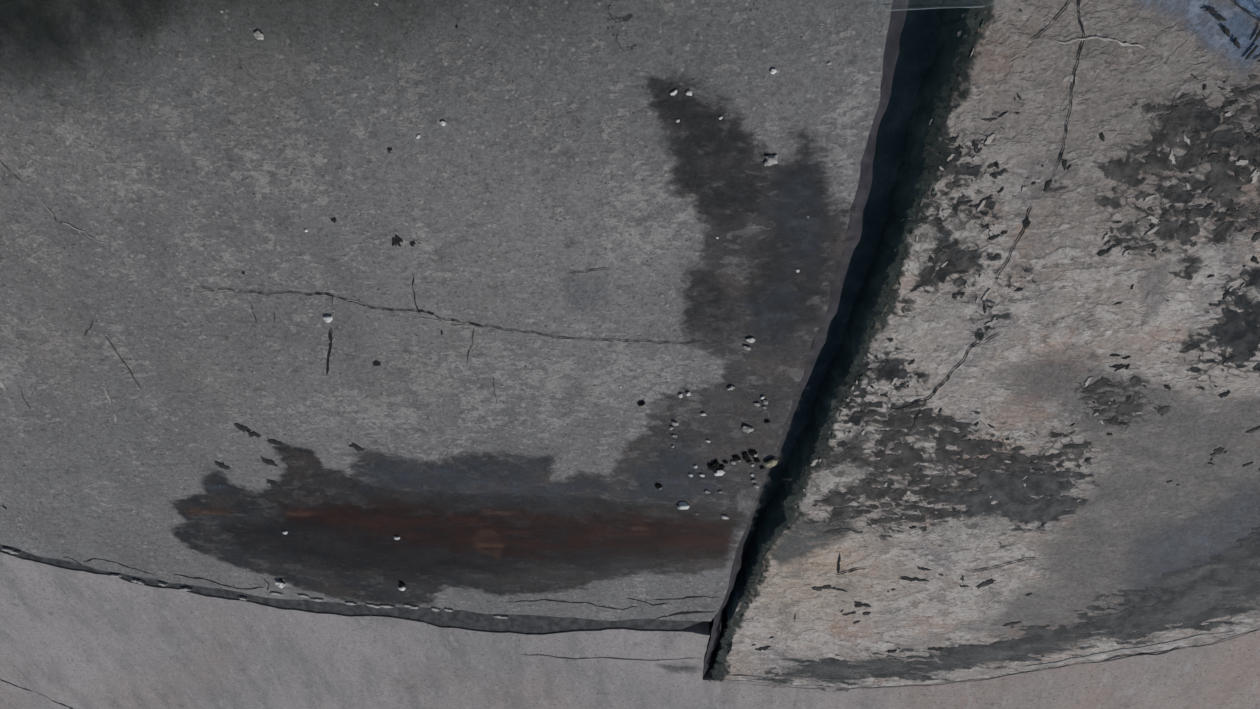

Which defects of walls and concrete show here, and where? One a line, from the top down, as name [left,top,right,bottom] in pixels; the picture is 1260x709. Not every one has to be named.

peeling [1204,8,1260,62]
peeling [908,187,1004,262]
spalling [1098,240,1167,256]
crack [188,277,745,361]
damp [173,79,861,605]
crack [890,333,1001,432]
peeling [812,463,873,491]
peeling [932,516,1015,544]
crack [0,544,1259,689]
spalling [812,585,871,624]
spalling [887,566,944,592]
spalling [960,576,996,589]